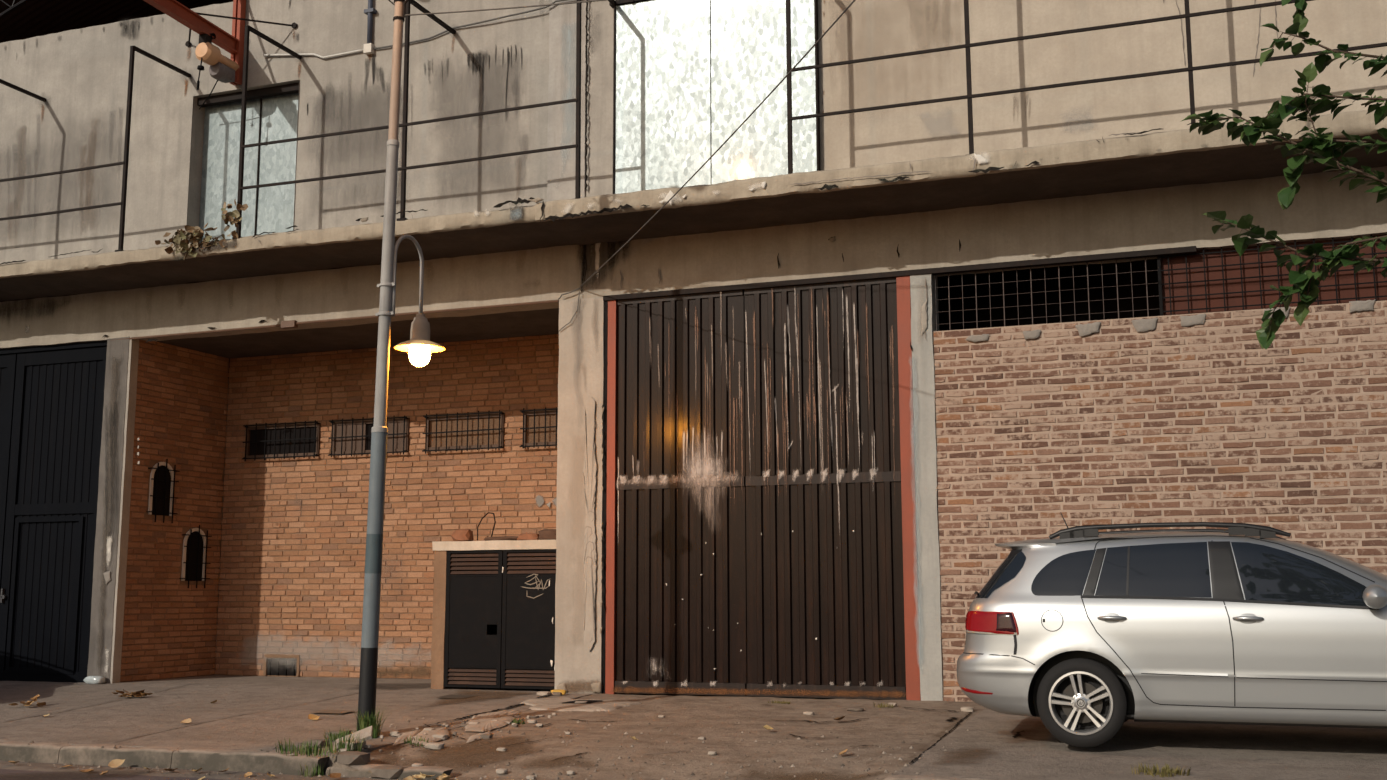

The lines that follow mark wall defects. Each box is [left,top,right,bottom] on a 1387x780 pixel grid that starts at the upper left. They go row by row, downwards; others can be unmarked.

damp [467,45,522,120]